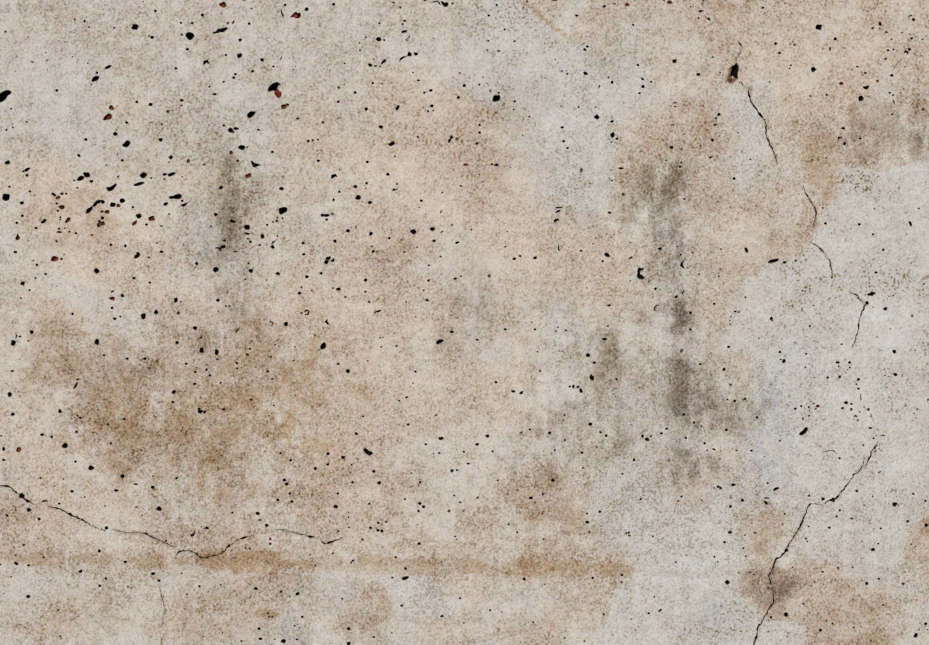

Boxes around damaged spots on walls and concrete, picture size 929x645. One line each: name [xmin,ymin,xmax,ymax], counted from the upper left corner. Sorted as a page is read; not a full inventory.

crack [740,81,777,162]
crack [804,188,833,278]
crack [852,293,867,347]
crack [0,485,251,559]
crack [275,529,342,544]
crack [753,394,885,645]